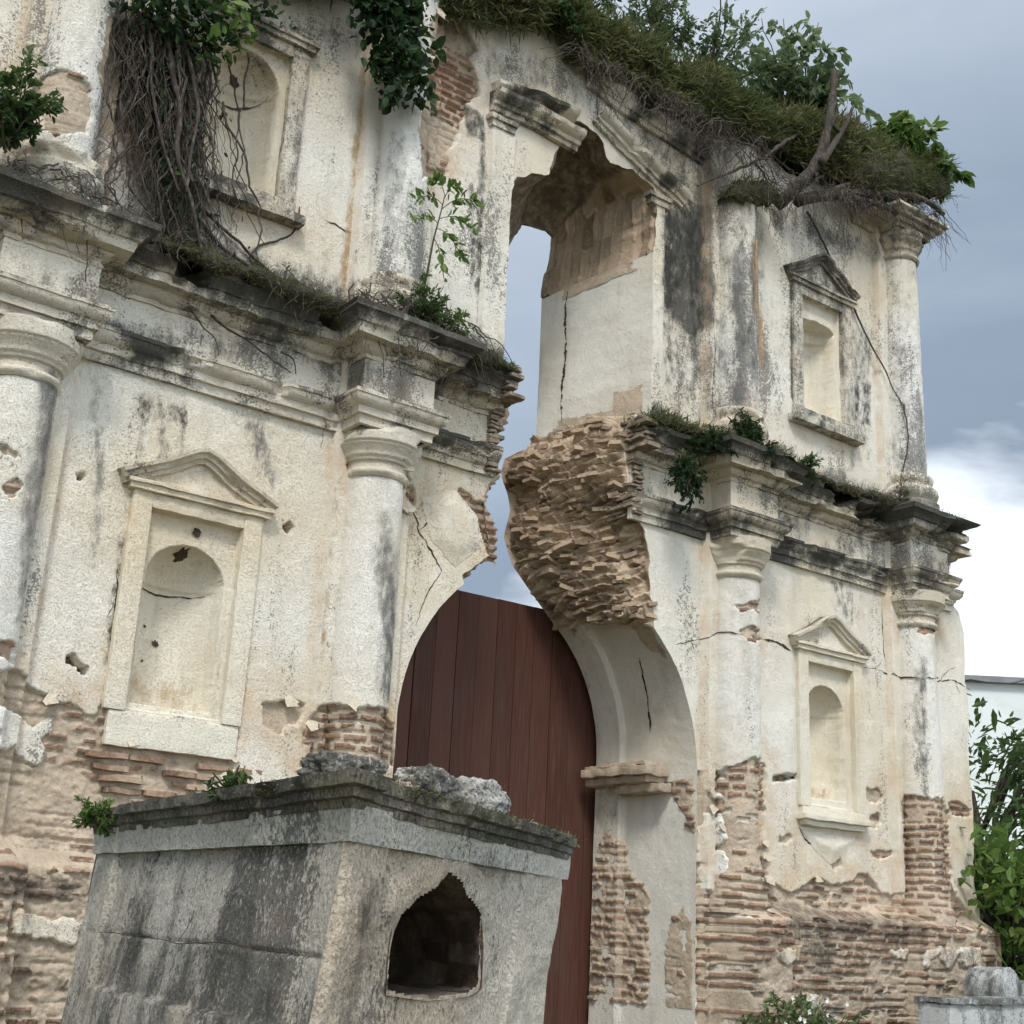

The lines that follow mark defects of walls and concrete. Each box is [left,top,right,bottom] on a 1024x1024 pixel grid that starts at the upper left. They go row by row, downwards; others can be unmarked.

spalling [418,8,478,181]
water stain [664,201,704,309]
crack [560,291,568,421]
water stain [374,512,395,697]
crack [413,512,442,624]
spalling [458,363,667,658]
crack [639,658,651,728]
crack [676,631,791,651]
crack [863,608,969,693]
spalling [0,640,240,1024]
spalling [587,834,652,1004]
spalling [664,759,1002,1024]